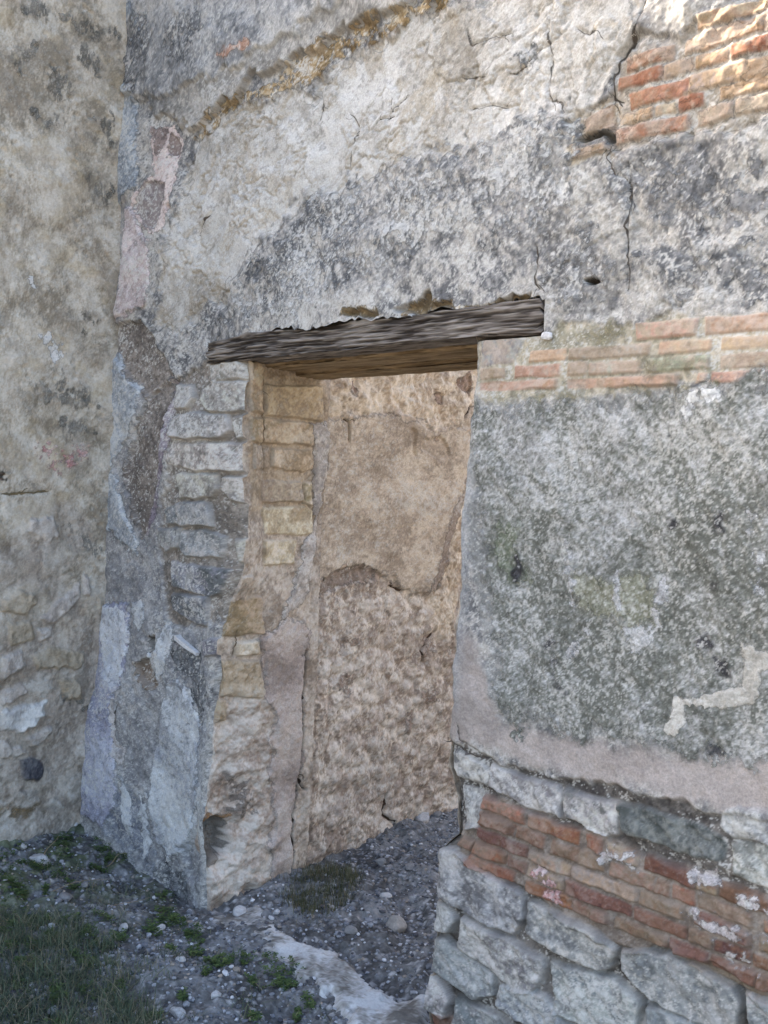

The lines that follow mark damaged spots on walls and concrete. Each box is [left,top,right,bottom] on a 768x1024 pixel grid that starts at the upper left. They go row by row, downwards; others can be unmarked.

crack [613,0,647,113]
crack [599,146,636,290]
flaking render [106,0,768,557]
flaking render [258,411,471,881]
crack [290,774,304,851]
damp [596,845,639,873]
damp [687,867,722,893]
damp [681,905,751,963]
damp [735,894,768,915]